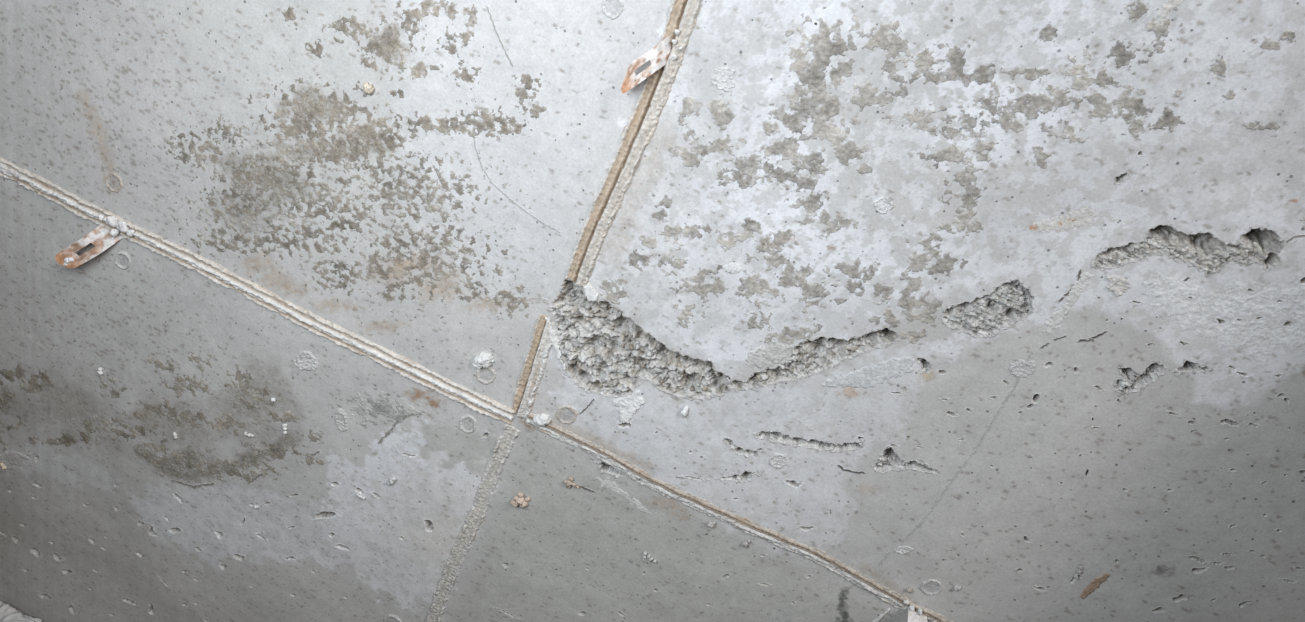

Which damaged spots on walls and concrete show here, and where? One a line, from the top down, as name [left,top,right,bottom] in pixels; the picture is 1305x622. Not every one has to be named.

peeling [1210,54,1236,103]
peeling [1237,120,1280,132]
spalling [146,0,1186,401]
spalling [1089,223,1289,300]
spalling [1091,339,1254,404]
peeling [0,351,339,506]
spalling [673,429,941,502]